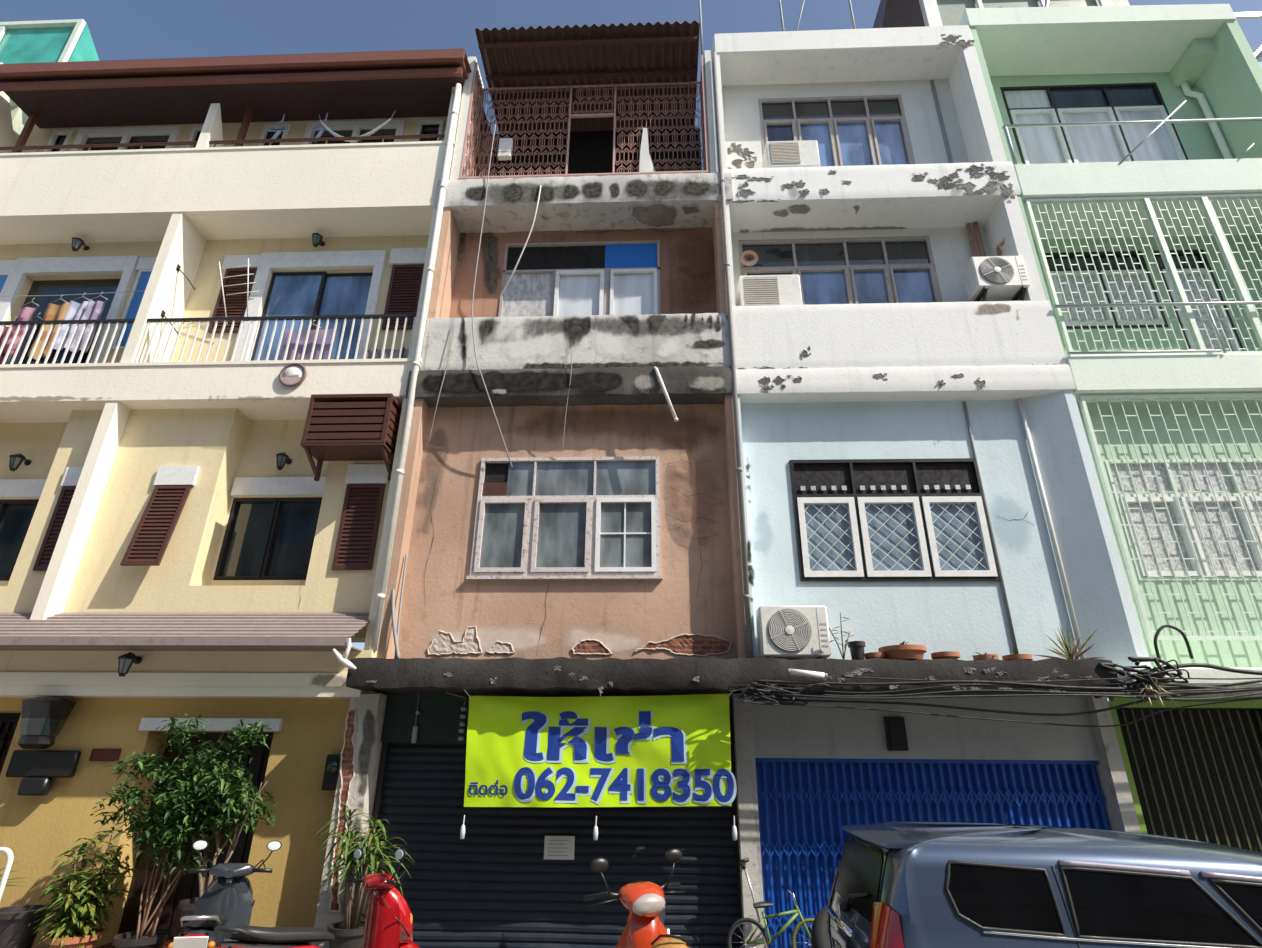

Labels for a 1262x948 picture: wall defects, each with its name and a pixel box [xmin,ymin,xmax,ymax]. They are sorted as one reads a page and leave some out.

peeling [937,34,975,50]
mould [466,180,726,204]
peeling [727,142,830,204]
peeling [913,163,1015,199]
damp [422,232,728,393]
peeling [737,346,811,393]
peeling [936,365,986,391]
flaking render [427,626,515,656]
flaking render [571,639,612,655]
flaking render [635,633,731,657]
flaking render [329,708,357,913]